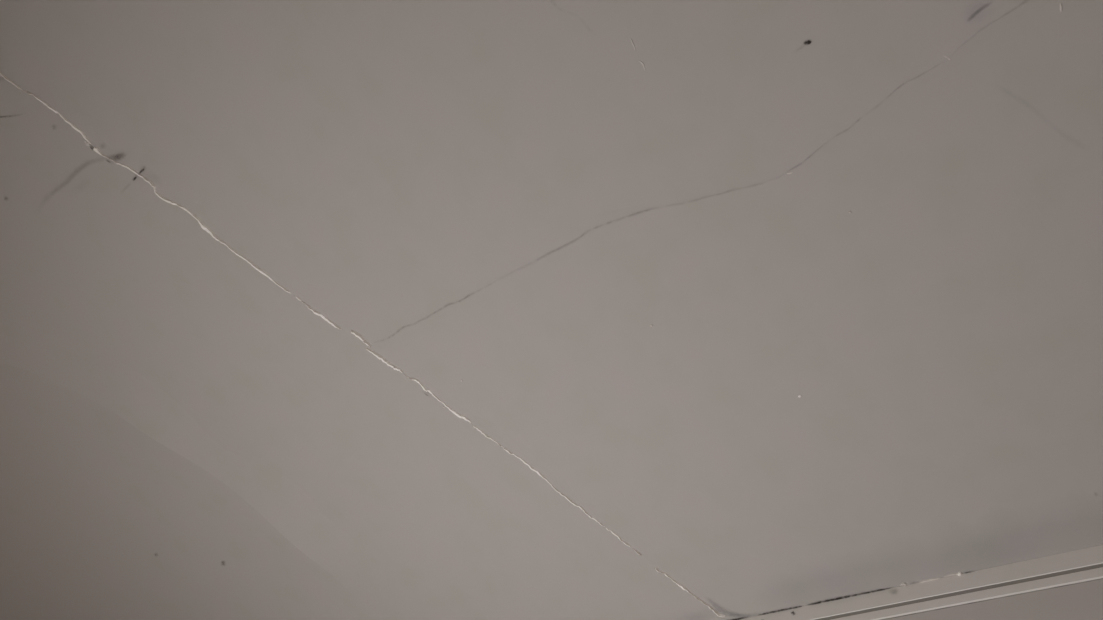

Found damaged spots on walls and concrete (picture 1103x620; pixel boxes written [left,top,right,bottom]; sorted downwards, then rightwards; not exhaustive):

crack [0,66,885,620]